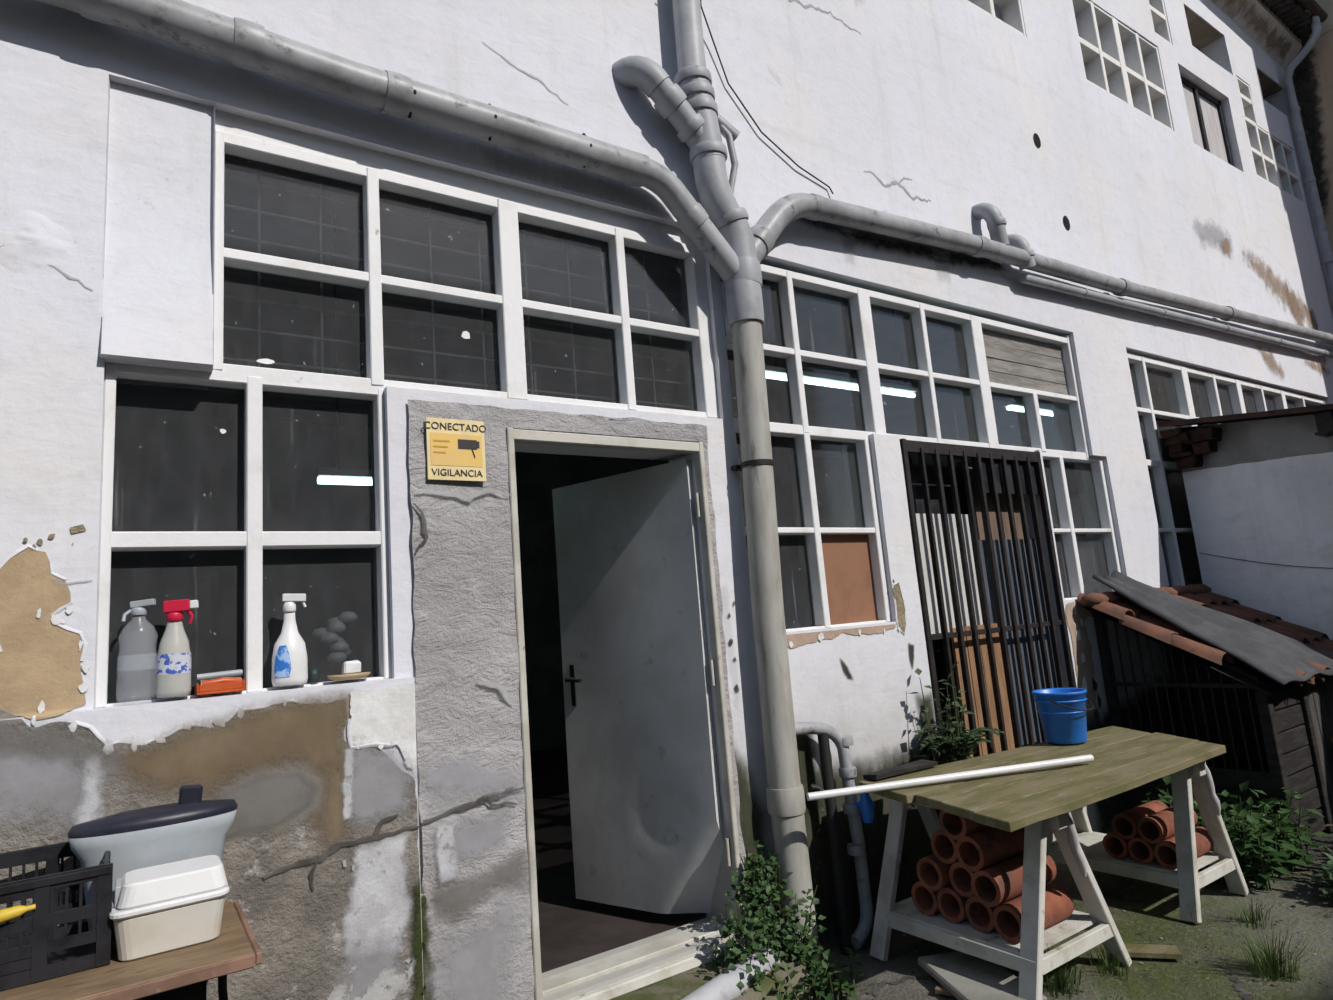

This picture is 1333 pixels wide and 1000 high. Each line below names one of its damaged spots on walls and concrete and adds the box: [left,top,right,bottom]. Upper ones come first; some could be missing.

crack [789,0,861,34]
crack [482,41,568,105]
crack [864,171,931,202]
damp [1197,226,1230,254]
crack [48,265,93,291]
peeling [786,578,914,668]
peeling [0,524,420,1000]
crack [263,787,524,891]